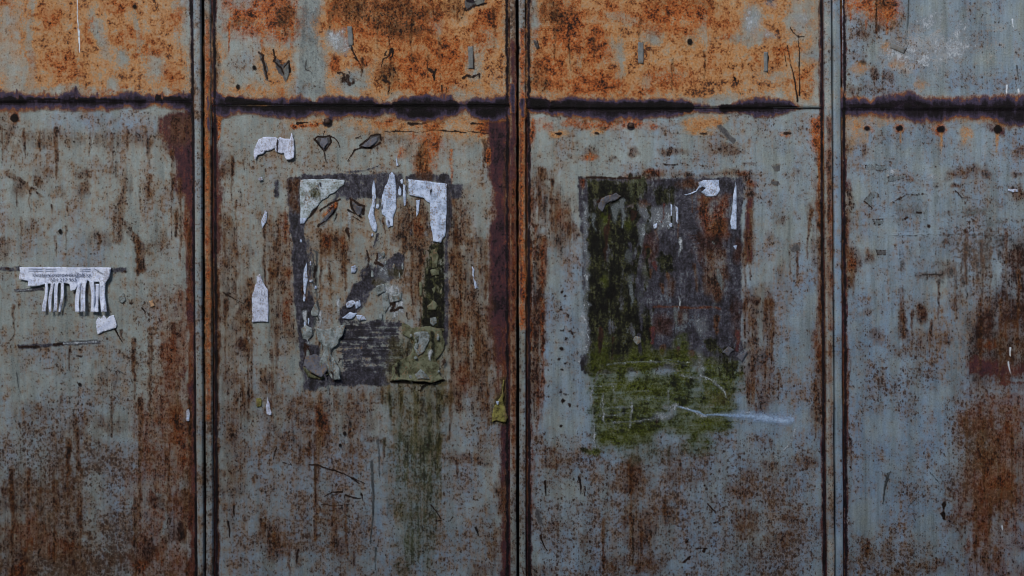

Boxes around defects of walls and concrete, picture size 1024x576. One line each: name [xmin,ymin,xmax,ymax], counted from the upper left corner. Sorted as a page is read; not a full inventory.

rust [0,0,205,576]
peeling [308,197,365,227]
rust [203,0,833,576]
rust [840,0,1024,576]